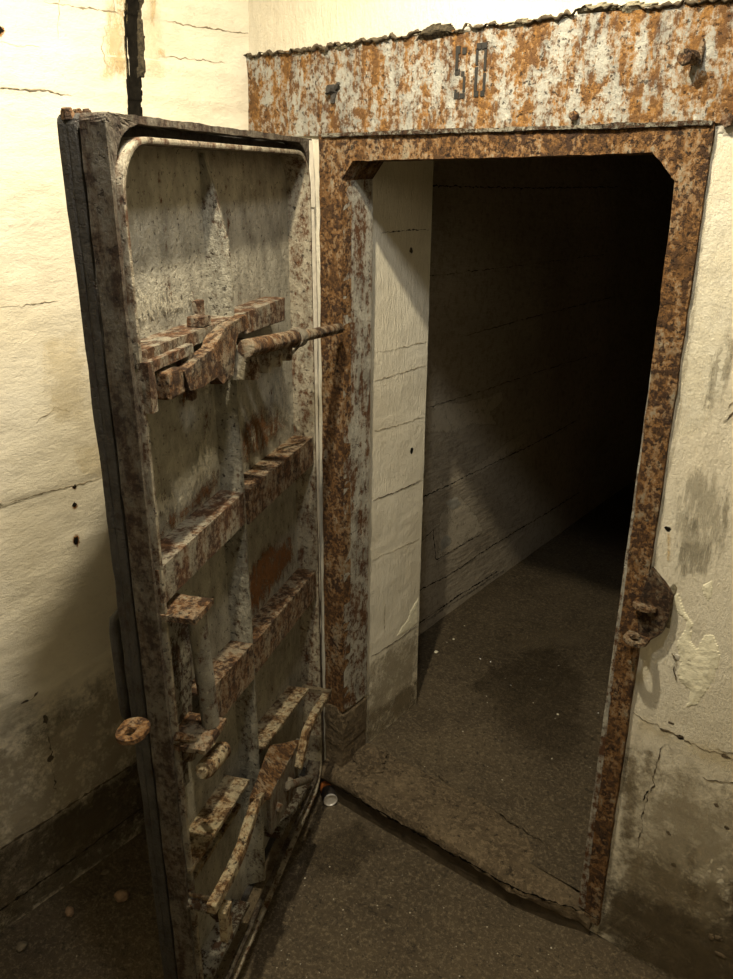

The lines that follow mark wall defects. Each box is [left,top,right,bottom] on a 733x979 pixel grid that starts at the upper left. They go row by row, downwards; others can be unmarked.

corrosion [249,537,295,613]
peeling [666,581,721,707]
crack [637,715,733,847]
crack [337,786,598,920]
leakage [599,758,733,979]